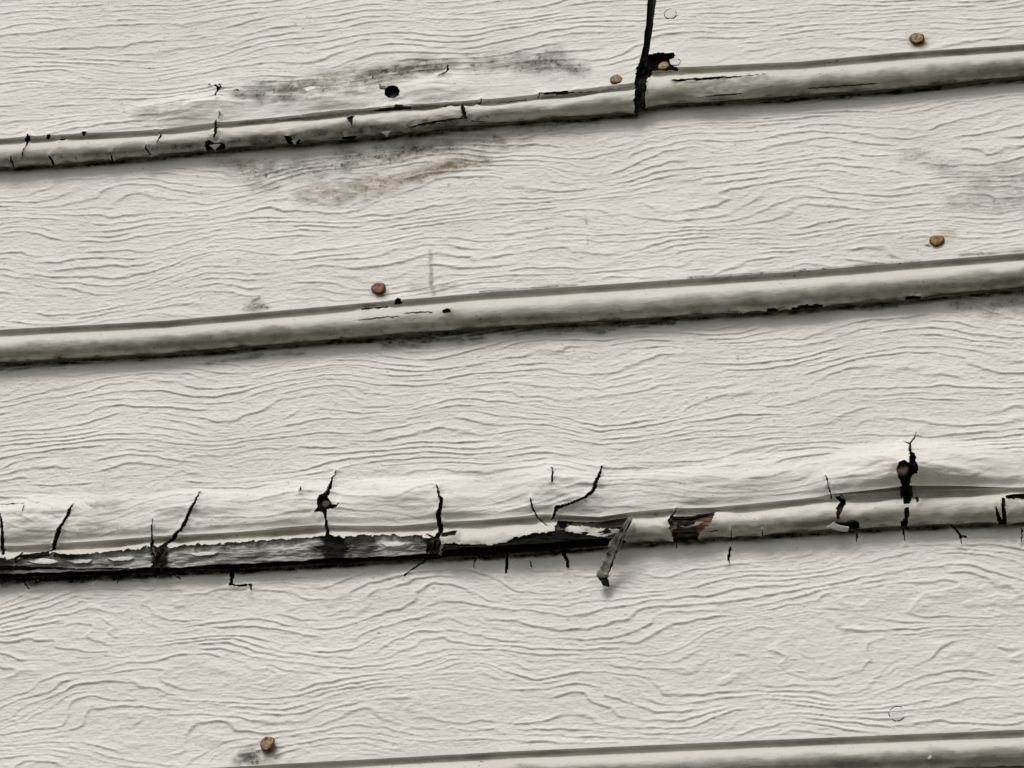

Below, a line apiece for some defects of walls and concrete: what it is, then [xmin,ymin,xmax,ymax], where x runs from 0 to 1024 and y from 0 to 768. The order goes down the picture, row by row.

leakage [235,59,443,103]
crack [0,503,76,590]
crack [149,494,199,579]
crack [288,477,339,537]
crack [405,485,457,576]
spalling [425,518,628,557]
crack [530,467,602,526]
peeling [668,509,715,539]
crack [826,478,860,542]
crack [896,433,919,541]
crack [996,495,1024,542]